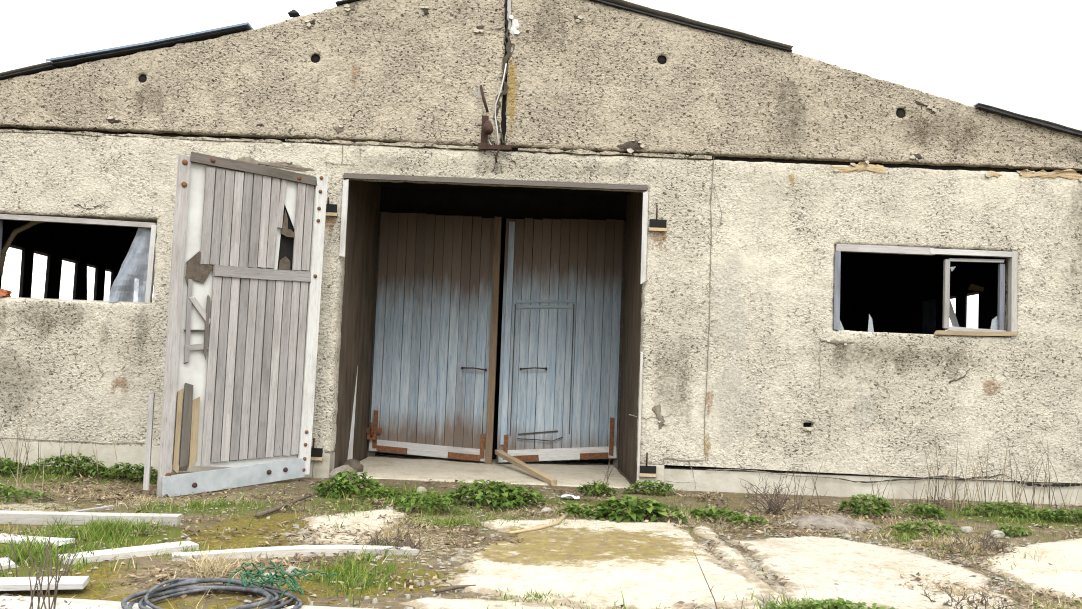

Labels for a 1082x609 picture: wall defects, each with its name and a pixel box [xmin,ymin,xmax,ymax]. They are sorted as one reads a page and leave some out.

spalling [830,160,887,174]
spalling [1017,169,1082,182]
crack [663,156,1082,489]